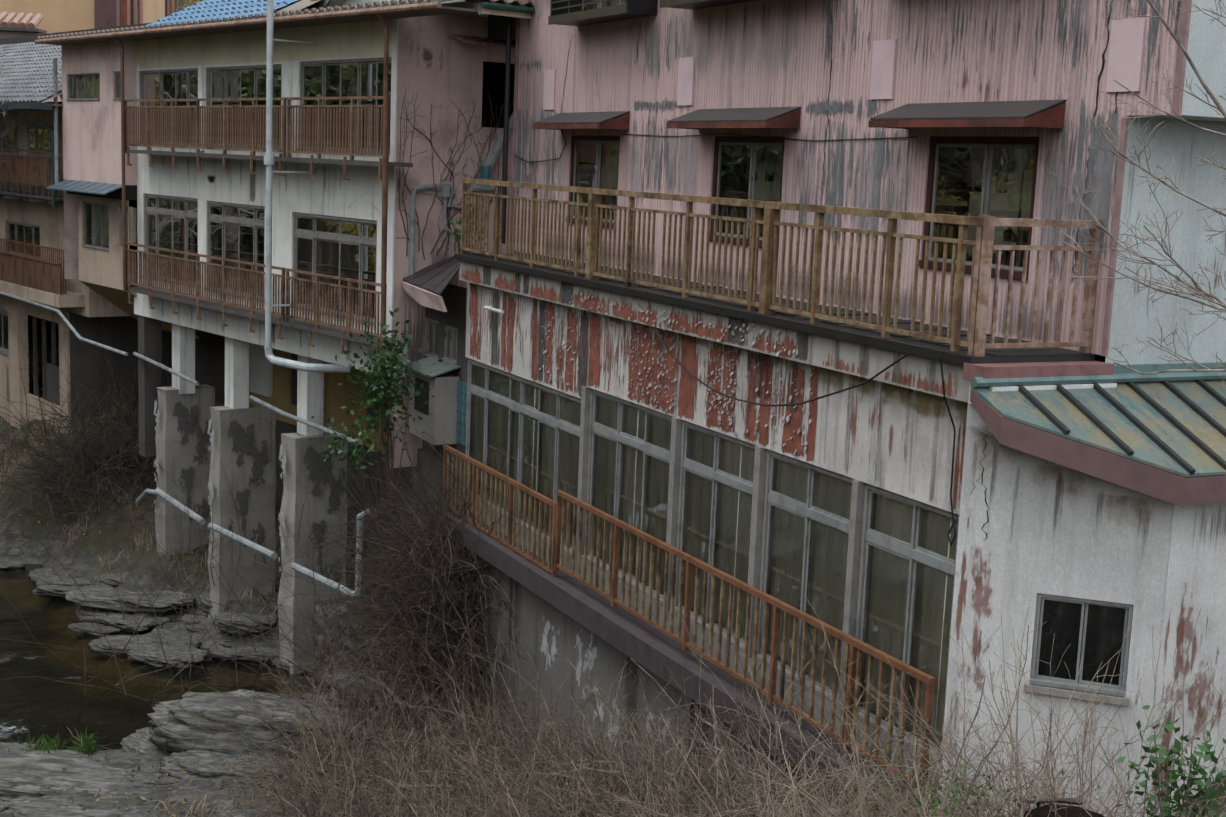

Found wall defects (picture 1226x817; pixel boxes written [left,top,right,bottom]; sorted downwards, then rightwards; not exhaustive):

crack [1071,0,1131,283]
peeling [461,268,869,461]
peeling [885,369,958,396]
leakage [173,402,211,541]
leakage [227,420,268,568]
leakage [303,446,345,598]
crack [970,434,990,540]
leakage [539,613,560,674]
leakage [574,629,670,754]
leakage [687,699,708,779]
corrosion [956,549,993,691]
corrosion [1149,598,1222,811]